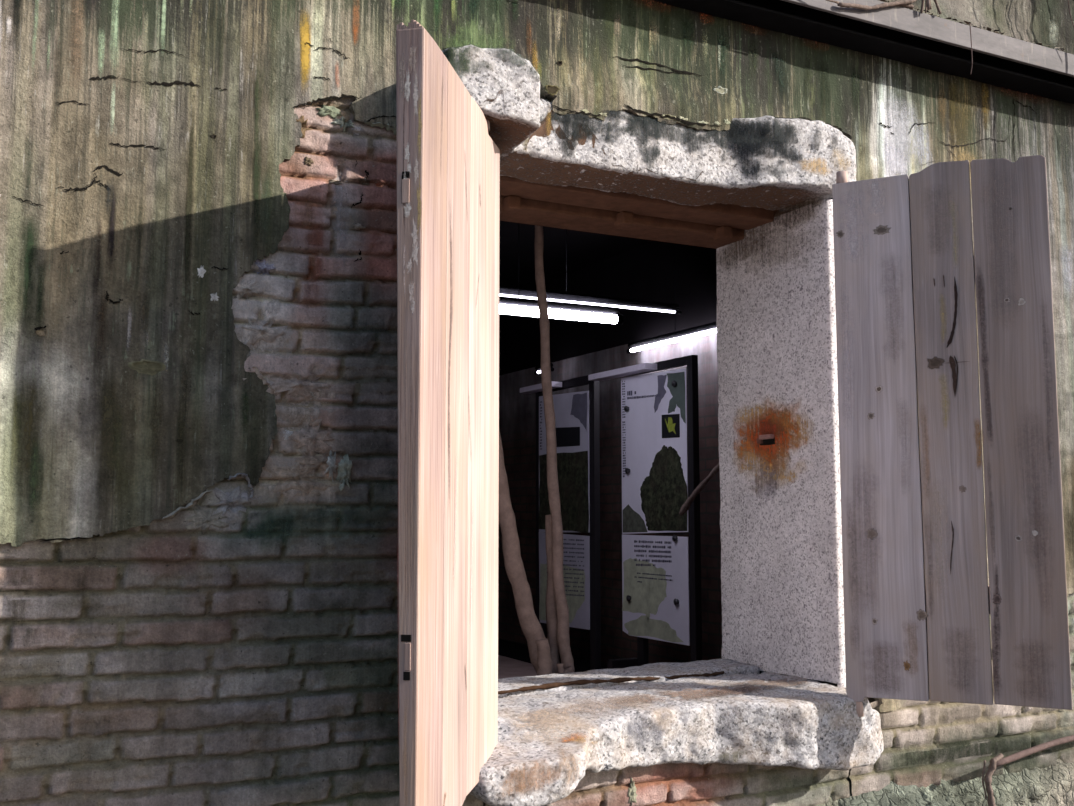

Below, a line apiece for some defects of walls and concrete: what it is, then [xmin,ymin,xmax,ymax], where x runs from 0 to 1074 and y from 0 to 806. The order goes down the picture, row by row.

leakage [0,0,21,39]
crack [57,49,227,105]
leakage [300,16,310,82]
crack [11,143,166,206]
leakage [540,110,802,178]
leakage [185,127,194,289]
peeling [0,47,422,806]
rust [734,407,808,482]
crack [498,671,725,695]
crack [759,671,838,687]
peeling [551,593,1074,806]
peeling [462,794,490,806]